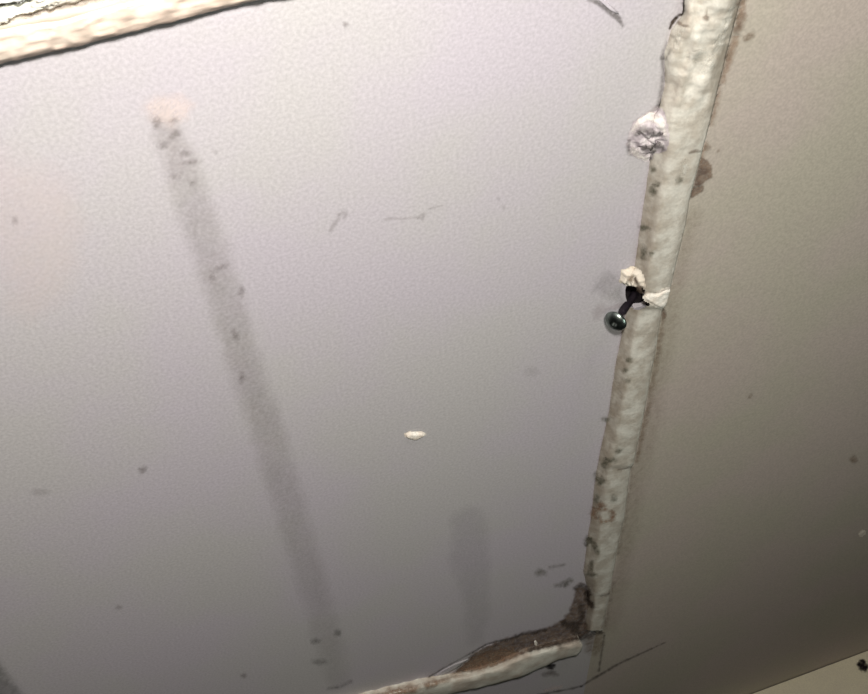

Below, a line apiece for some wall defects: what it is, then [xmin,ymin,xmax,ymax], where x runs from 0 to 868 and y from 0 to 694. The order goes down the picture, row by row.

peeling [0,0,80,24]
crack [669,2,708,29]